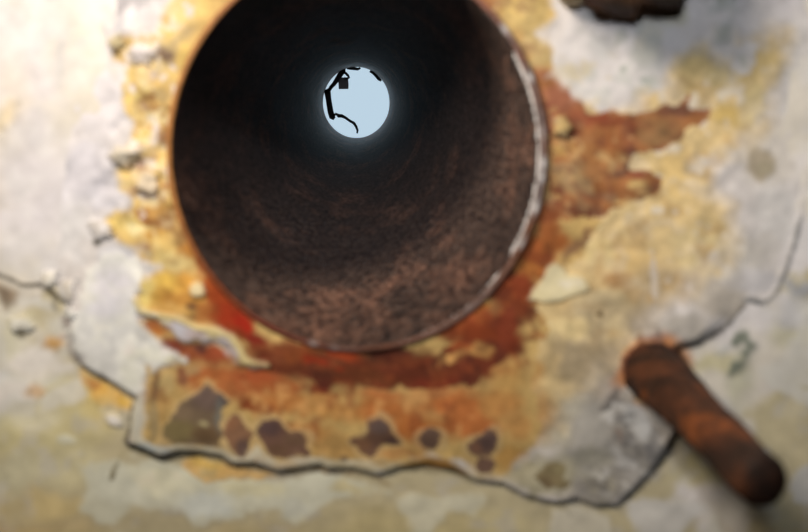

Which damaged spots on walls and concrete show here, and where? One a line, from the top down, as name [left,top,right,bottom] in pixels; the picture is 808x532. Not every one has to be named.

crack [0,270,113,385]
corrosion [76,367,132,414]
peeling [38,248,271,416]
peeling [74,378,503,532]
crack [108,395,670,518]
corrosion [101,0,711,484]
peeling [526,260,591,305]
corrosion [531,16,803,507]